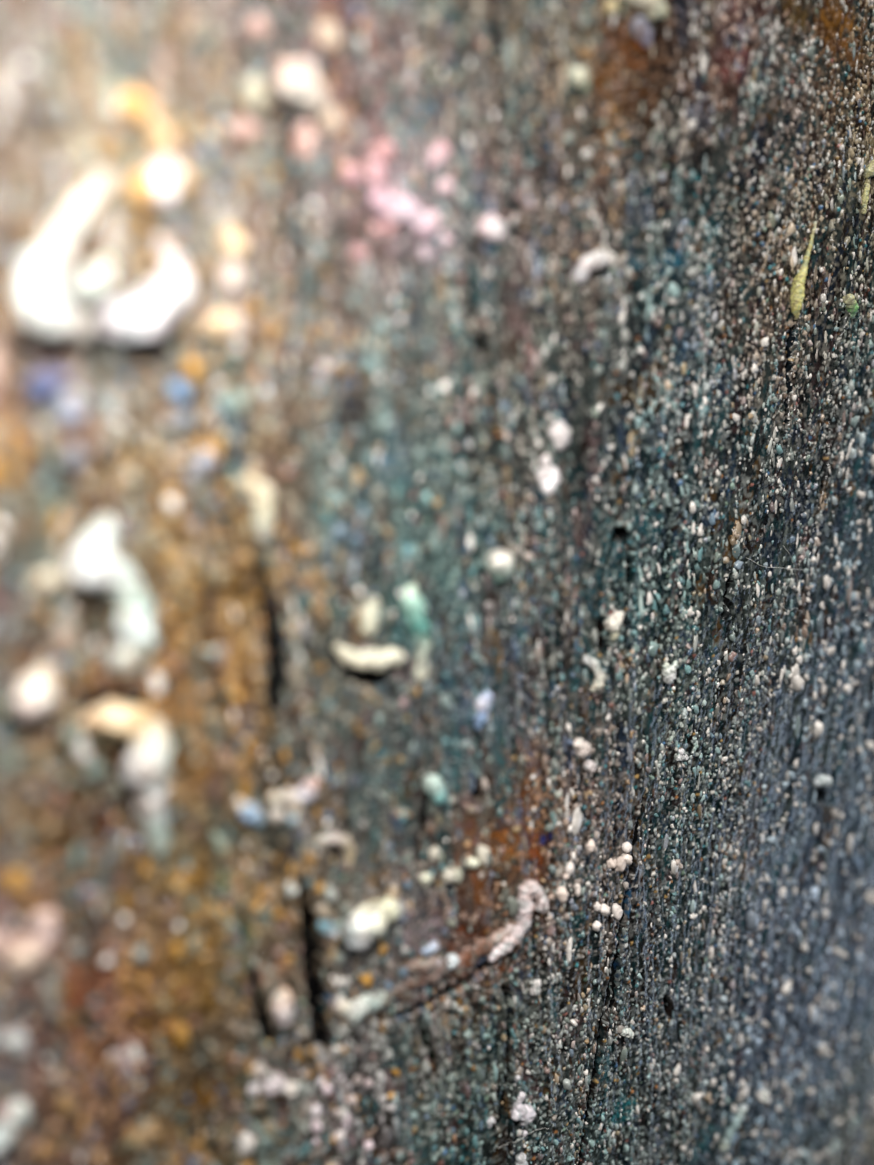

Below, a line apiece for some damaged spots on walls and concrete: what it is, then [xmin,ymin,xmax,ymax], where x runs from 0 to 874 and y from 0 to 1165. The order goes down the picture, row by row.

crack [607,527,632,597]
crack [596,619,605,653]
crack [578,802,643,1165]